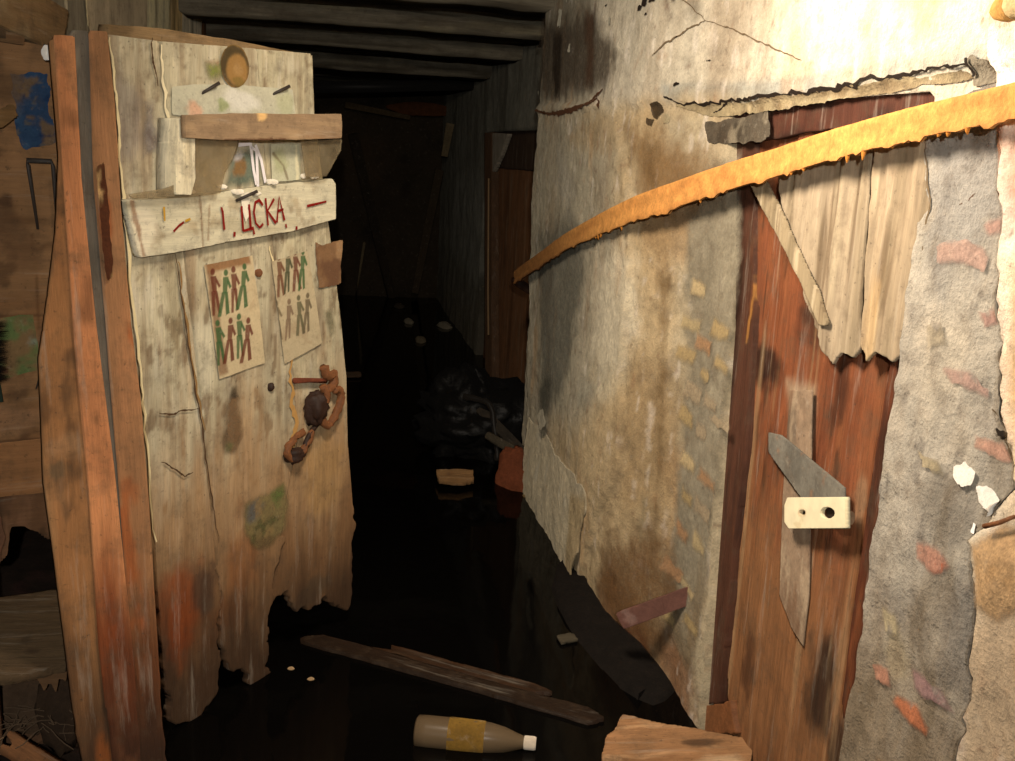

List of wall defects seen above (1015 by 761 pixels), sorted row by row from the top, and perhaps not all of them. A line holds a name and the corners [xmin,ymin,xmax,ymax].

crack [652,0,801,60]
spalling [646,55,997,144]
spalling [839,124,1015,761]